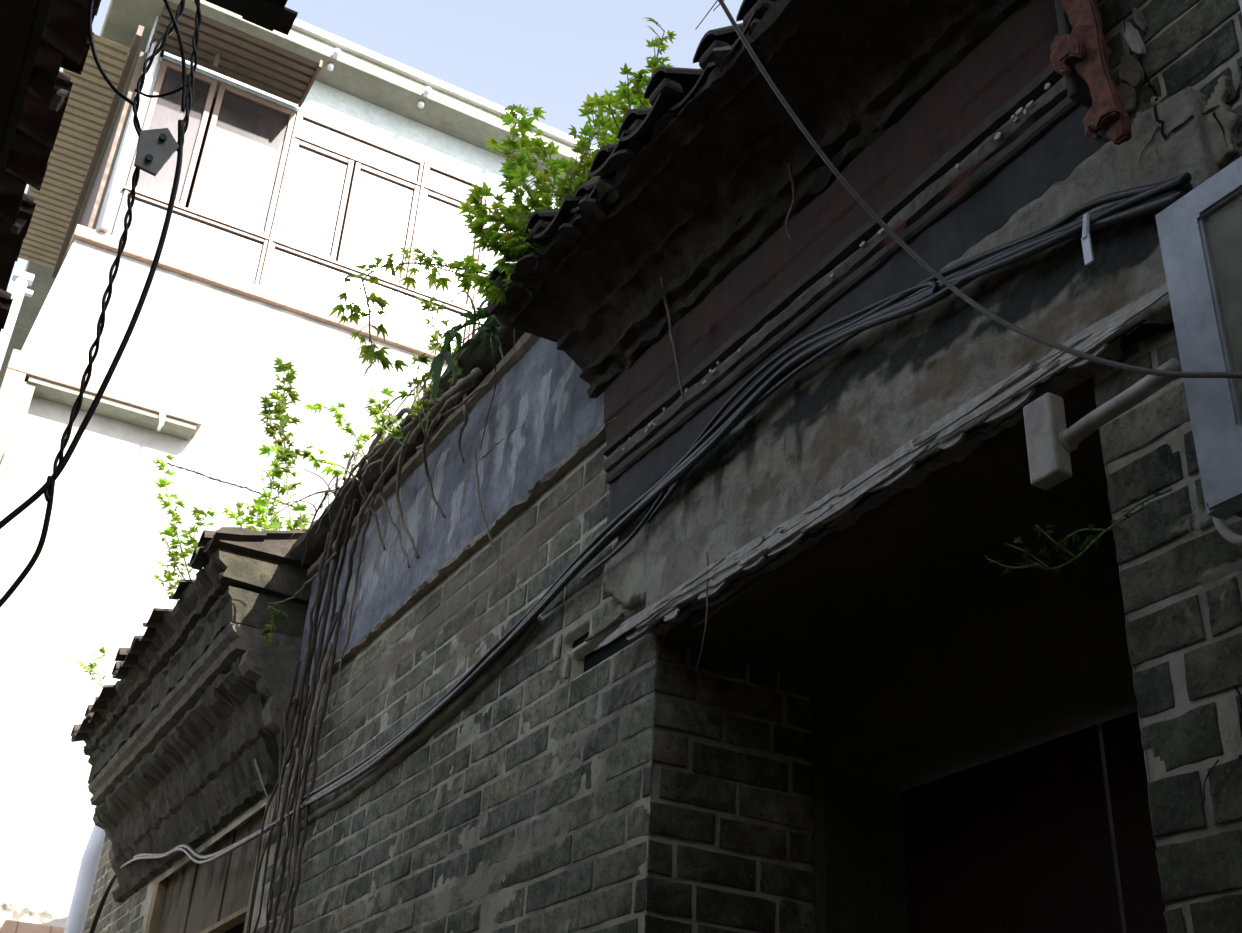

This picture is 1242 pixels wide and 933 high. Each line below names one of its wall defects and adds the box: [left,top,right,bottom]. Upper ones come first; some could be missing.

peeling [1011,100,1034,122]
crack [1138,43,1242,166]
leakage [645,208,1165,535]
flaking render [553,282,1168,680]
crack [1201,760,1219,822]
leakage [0,903,52,922]